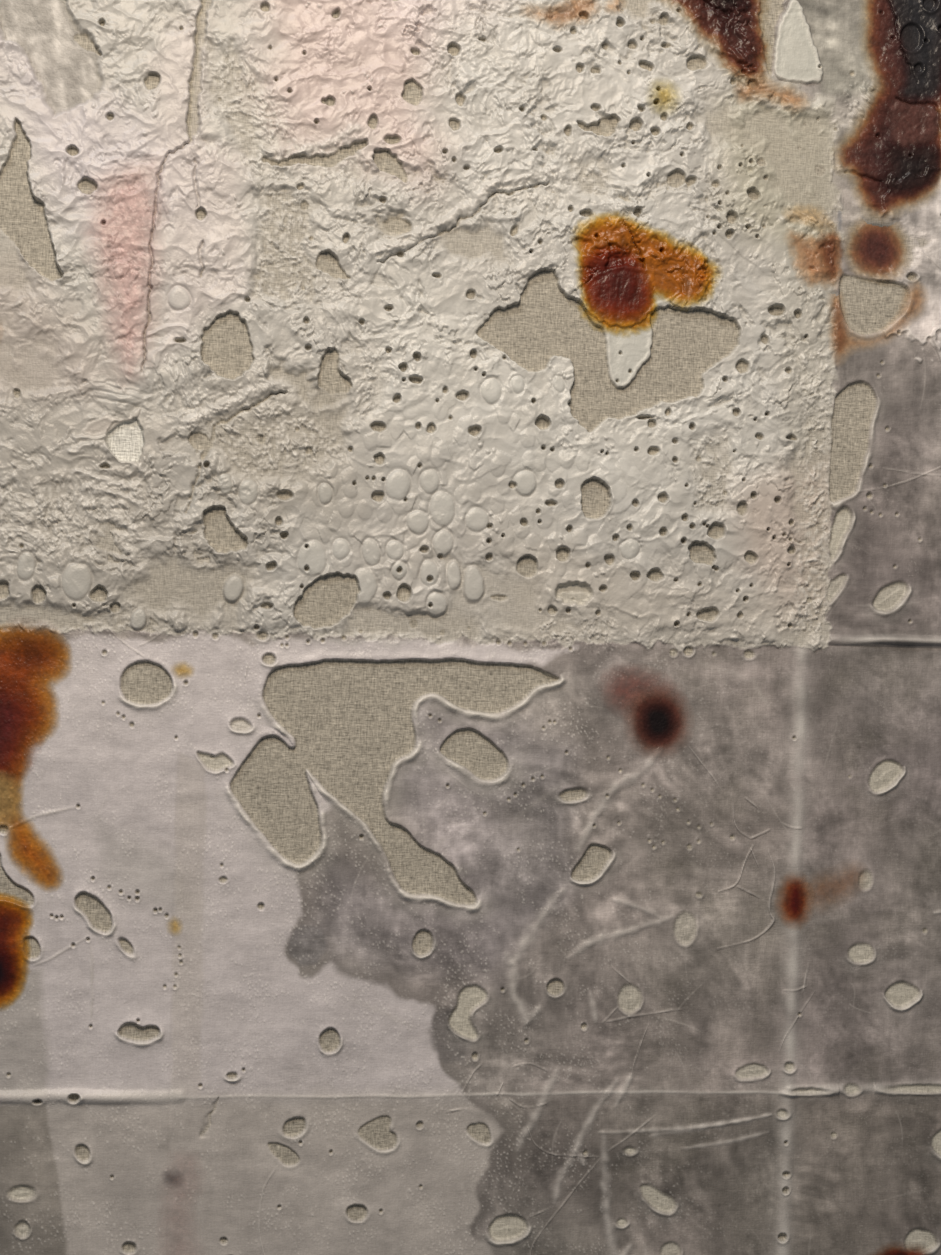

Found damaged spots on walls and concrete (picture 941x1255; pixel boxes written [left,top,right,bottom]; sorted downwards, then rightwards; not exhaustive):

peeling [0,114,68,285]
crack [140,0,205,373]
peeling [472,264,746,437]
rust [575,214,716,333]
rust [791,210,865,355]
peeling [836,271,913,339]
rust [884,287,922,337]
peeling [823,377,882,607]
rust [0,628,69,888]
peeling [195,653,565,911]
rust [0,894,32,1008]